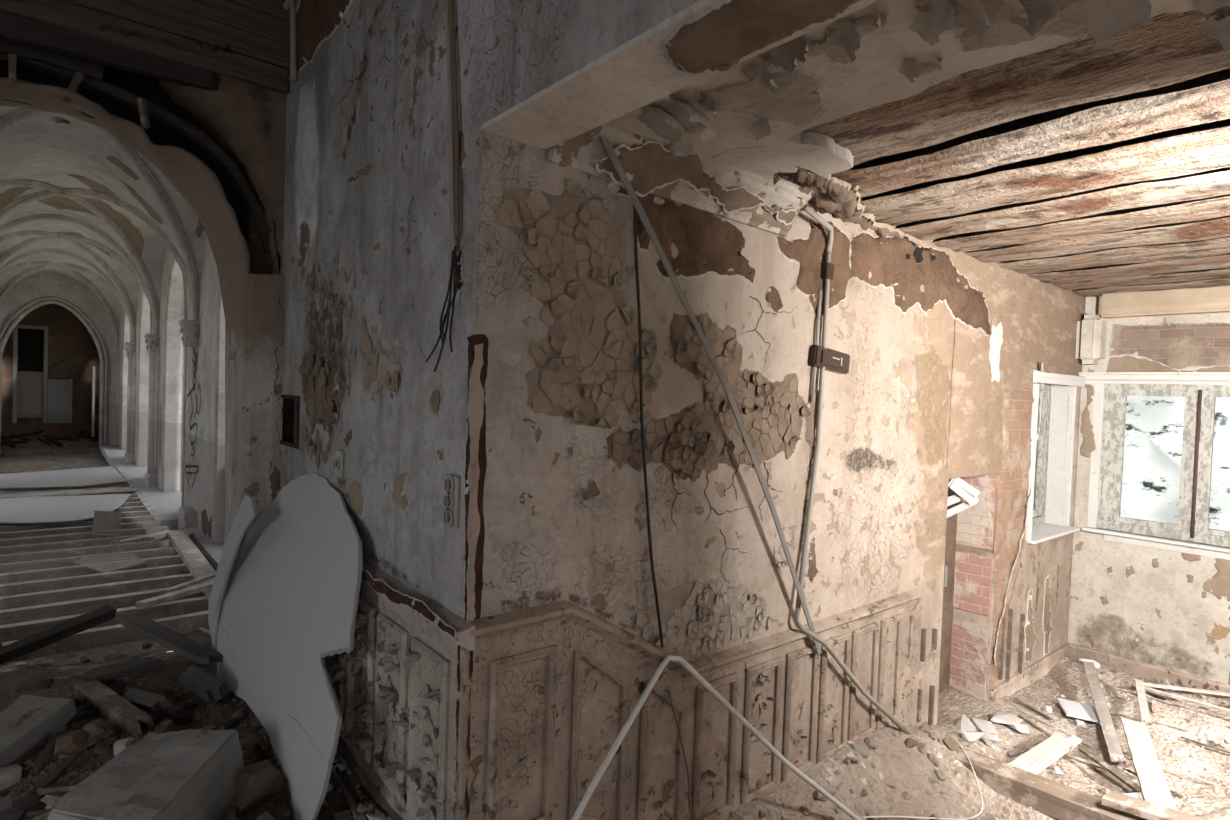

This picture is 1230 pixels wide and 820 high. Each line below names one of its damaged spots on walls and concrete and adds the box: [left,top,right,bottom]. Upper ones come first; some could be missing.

peeling [898,0,1152,83]
peeling [1192,0,1230,52]
flaking render [0,155,164,260]
peeling [495,0,1052,689]
peeling [298,347,353,468]
crack [671,462,783,583]
flaking render [1179,552,1230,611]
peeling [746,673,808,766]